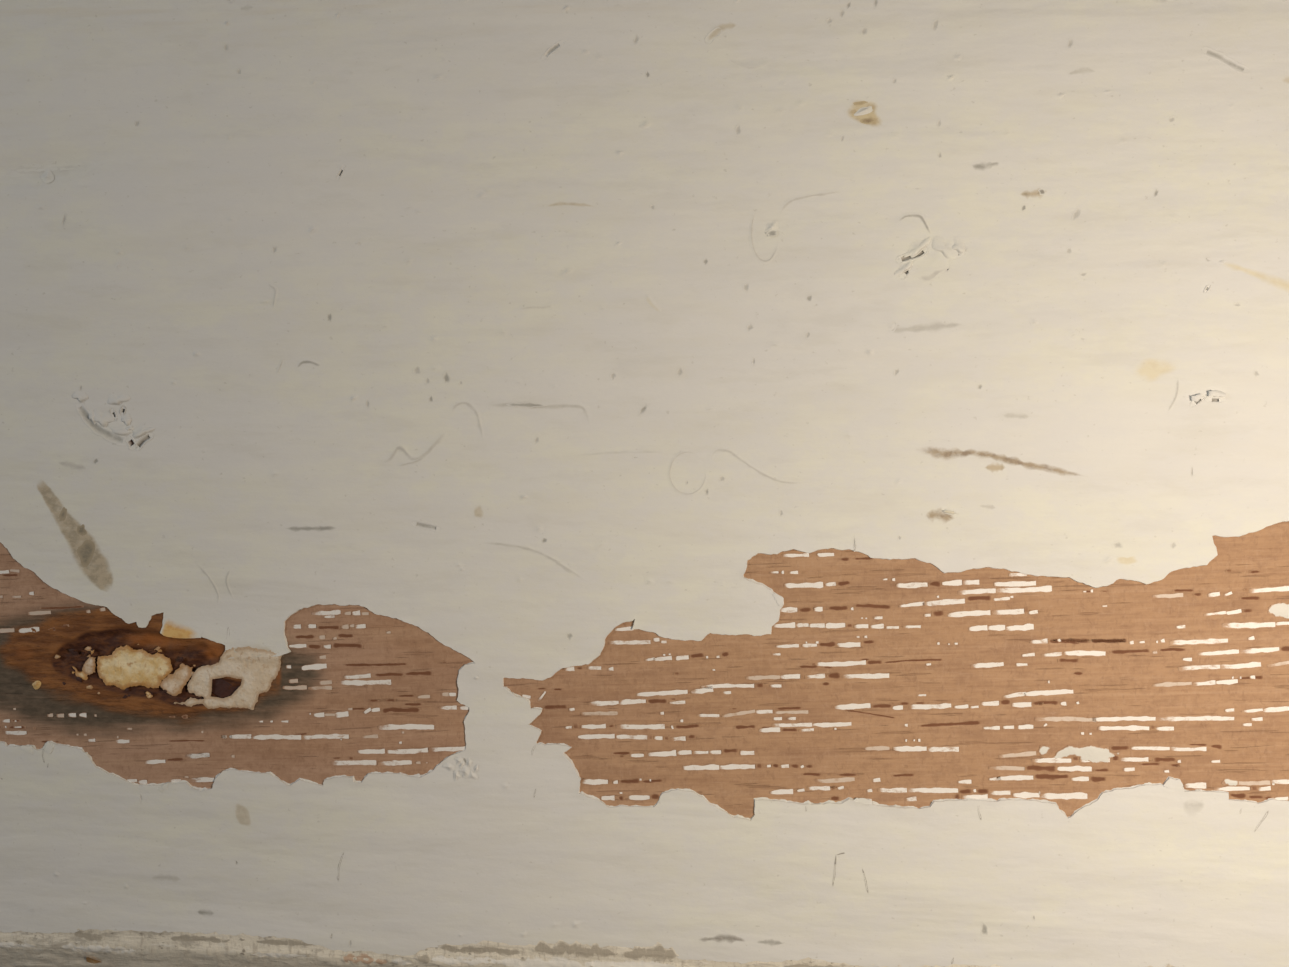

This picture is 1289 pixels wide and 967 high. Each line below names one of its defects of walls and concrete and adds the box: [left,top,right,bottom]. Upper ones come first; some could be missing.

peeling [0,542,106,633]
peeling [0,604,479,791]
peeling [504,521,1289,819]